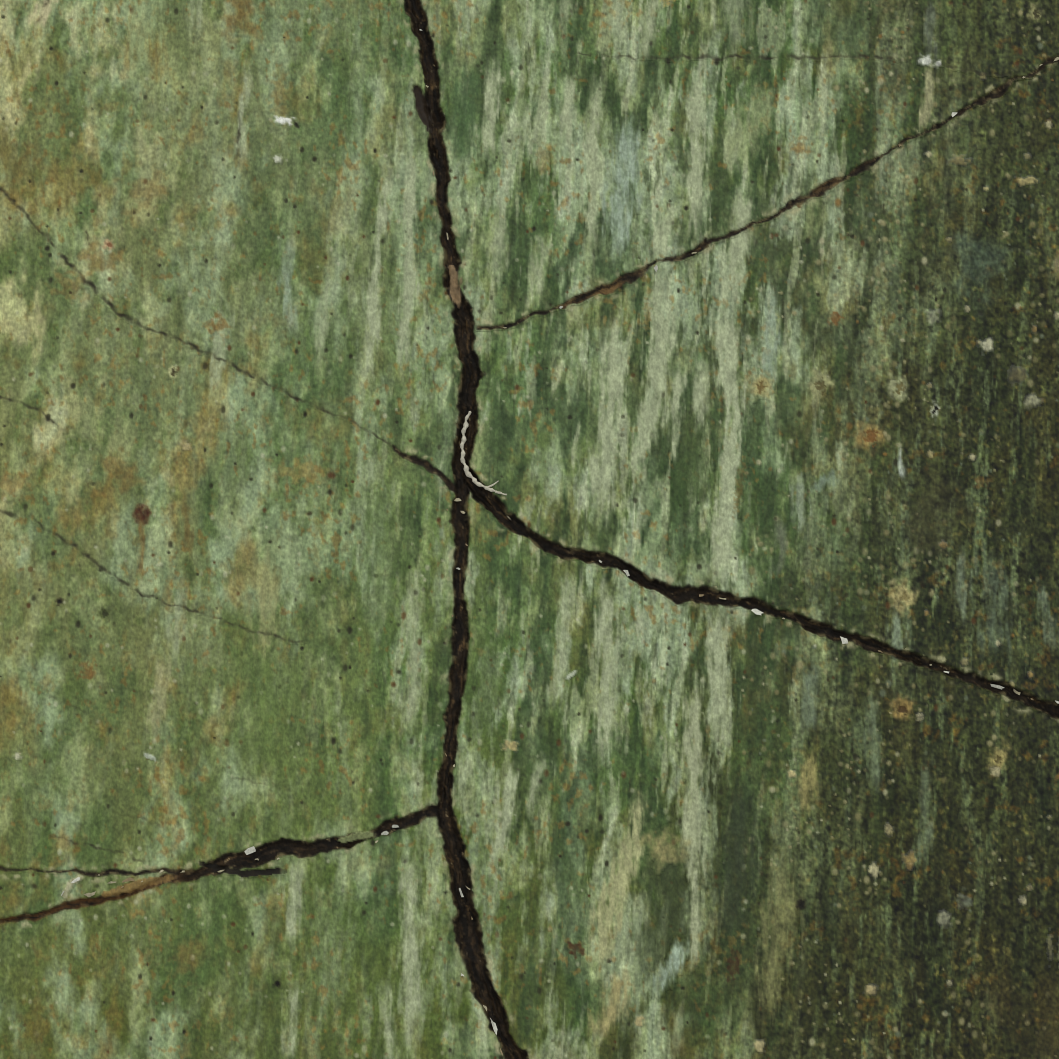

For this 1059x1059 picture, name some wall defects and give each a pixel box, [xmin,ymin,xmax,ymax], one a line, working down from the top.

crack [34,0,51,25]
crack [233,109,243,175]
crack [0,184,395,449]
crack [0,508,307,644]
crack [390,0,1059,1059]
crack [0,804,442,927]